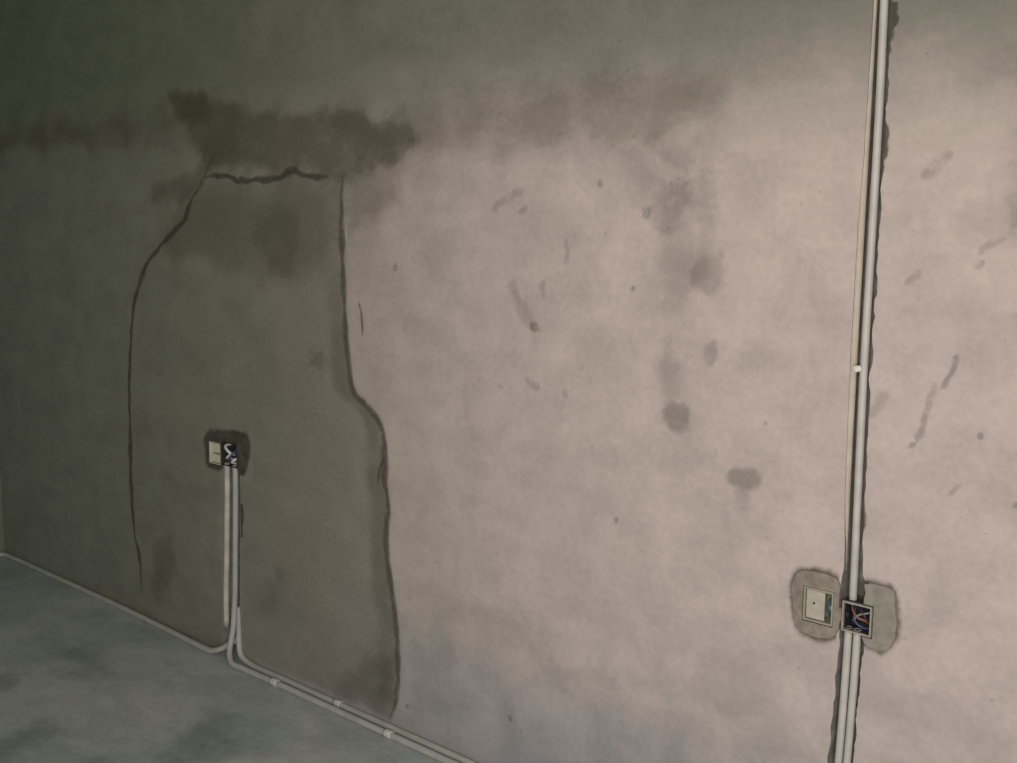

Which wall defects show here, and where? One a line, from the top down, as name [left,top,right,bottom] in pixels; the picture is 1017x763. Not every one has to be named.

crack [128,155,320,571]
crack [339,177,412,729]